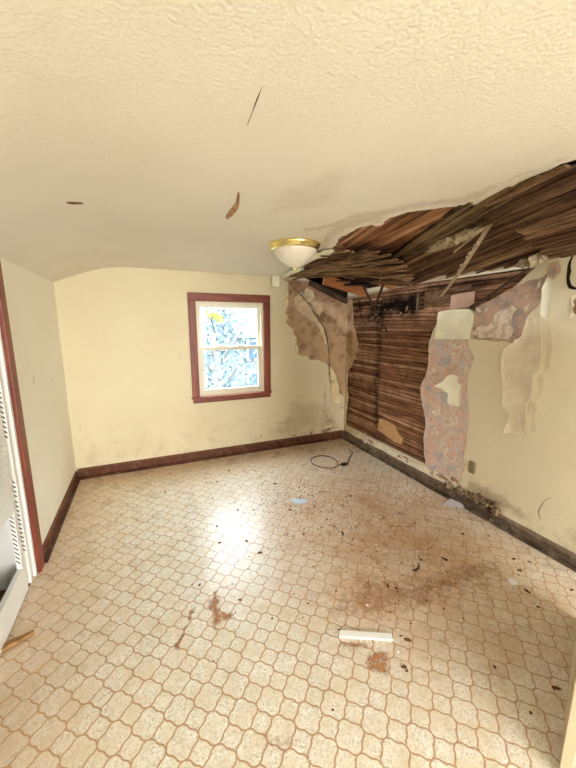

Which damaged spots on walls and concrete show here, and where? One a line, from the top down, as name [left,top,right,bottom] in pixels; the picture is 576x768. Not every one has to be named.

flaking render [283,261,560,520]